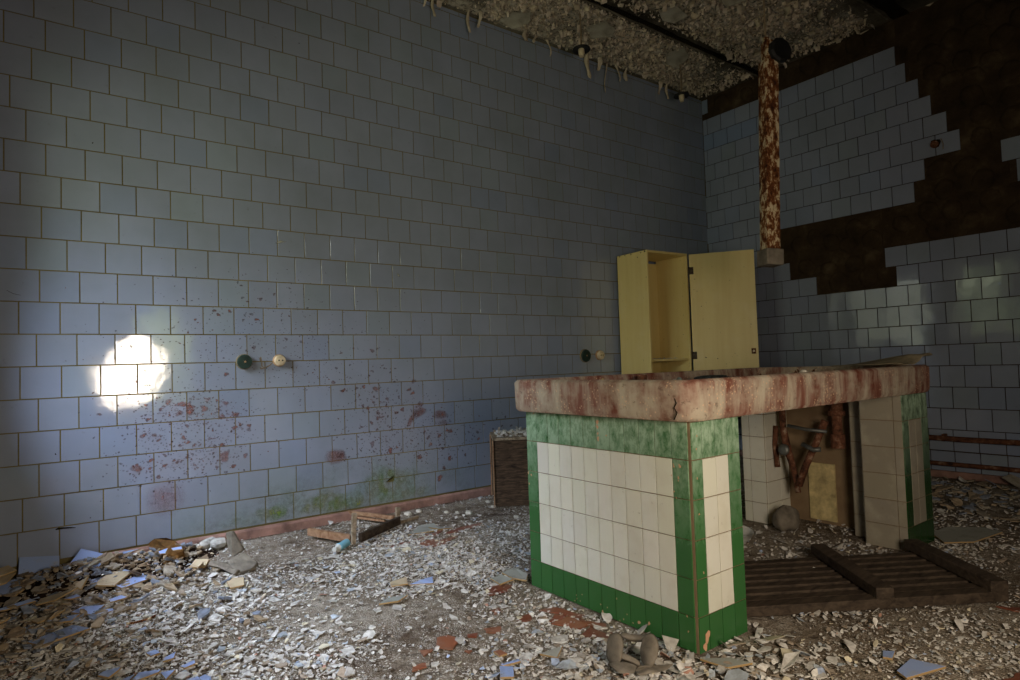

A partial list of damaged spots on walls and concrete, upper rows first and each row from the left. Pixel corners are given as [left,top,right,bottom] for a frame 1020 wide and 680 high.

peeling [428,0,895,119]
peeling [780,0,1020,295]